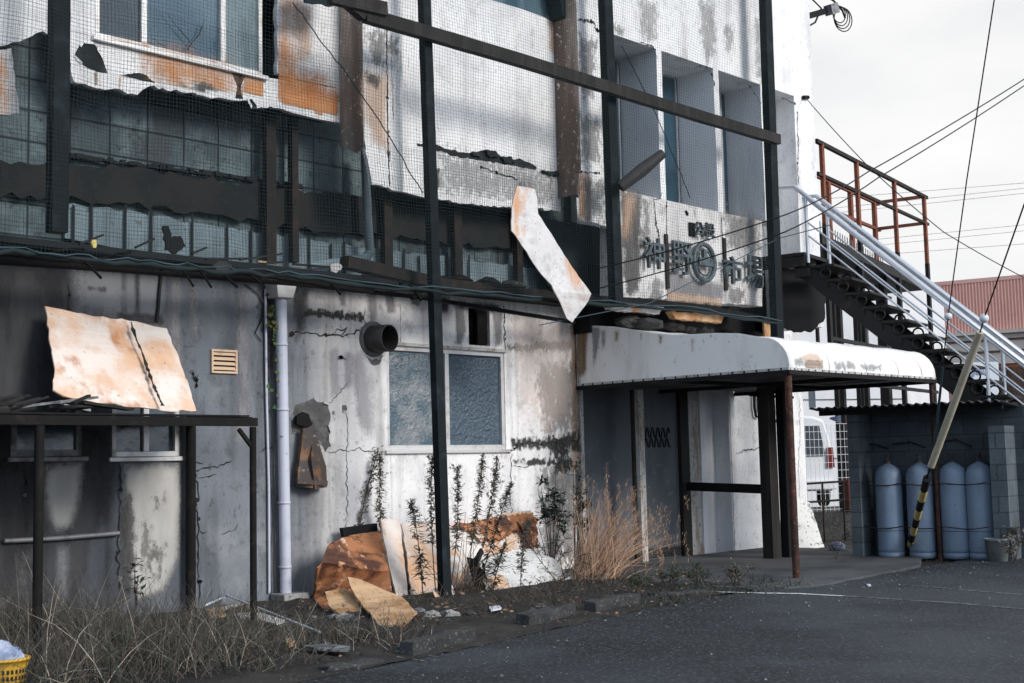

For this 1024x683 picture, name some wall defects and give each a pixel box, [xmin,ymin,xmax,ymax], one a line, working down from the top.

rust [155,57,225,92]
spalling [232,73,256,108]
rust [244,77,263,96]
rust [278,27,340,115]
peeling [470,149,516,164]
rust [803,353,822,367]
spalling [291,398,347,452]
crack [287,308,377,524]
water stain [511,431,582,475]
water stain [46,428,181,603]
crack [115,464,123,590]